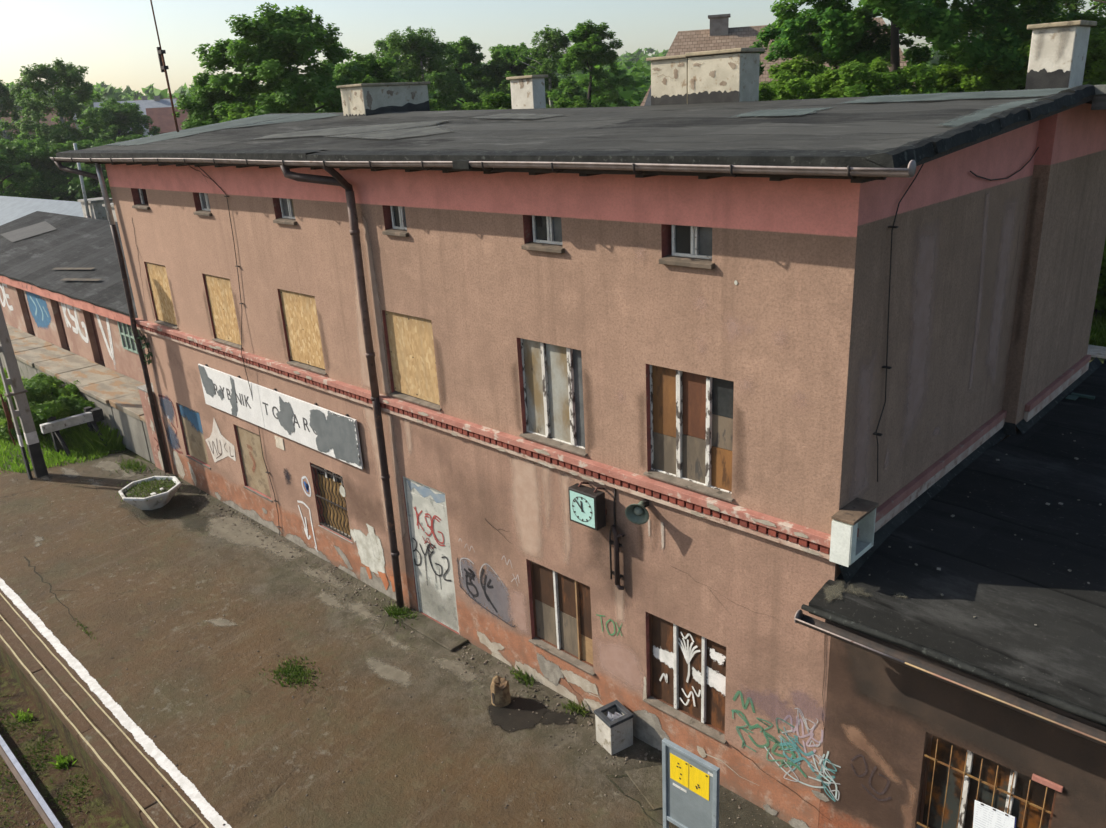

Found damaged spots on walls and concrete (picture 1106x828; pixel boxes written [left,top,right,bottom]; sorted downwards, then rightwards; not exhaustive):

flaking render [653,62,727,86]
crack [24,557,91,638]
spalling [209,492,409,649]
spalling [367,658,411,686]
spalling [432,657,483,681]
peeling [477,631,604,732]